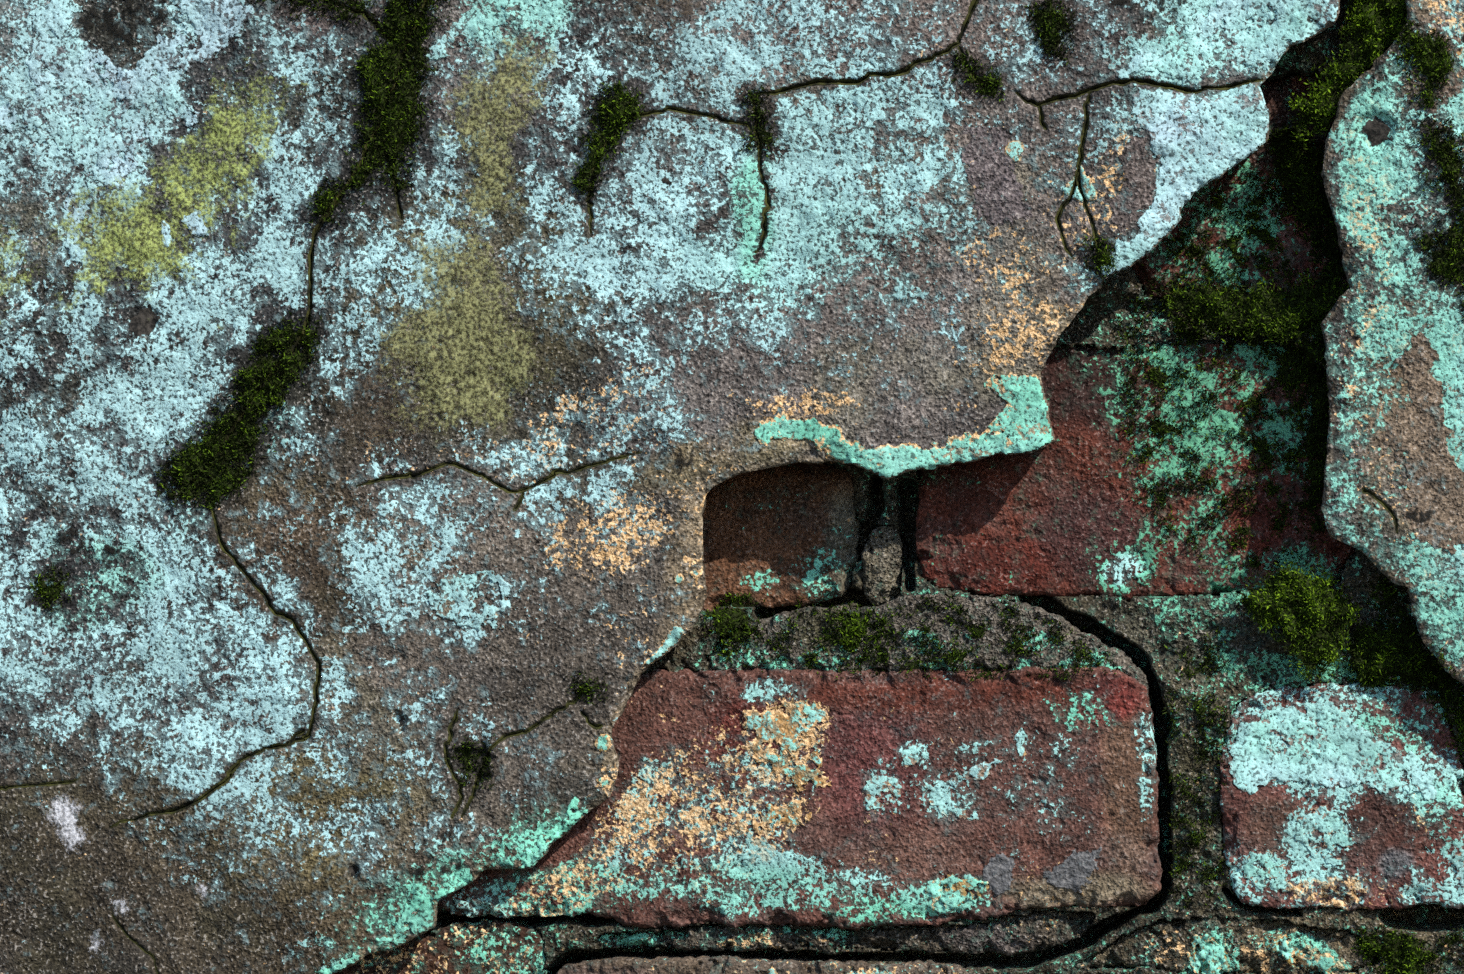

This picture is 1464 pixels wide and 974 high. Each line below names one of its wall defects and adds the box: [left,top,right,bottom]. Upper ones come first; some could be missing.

damp [60,84,283,292]
damp [335,40,552,450]
crack [585,0,1263,259]
spalling [1105,134,1162,236]
crack [109,0,430,828]
crack [356,451,642,511]
peeling [755,343,1056,480]
spalling [1377,332,1464,555]
damp [1406,500,1445,524]
crack [0,777,81,791]
peeling [509,547,707,870]
peeling [315,871,482,974]